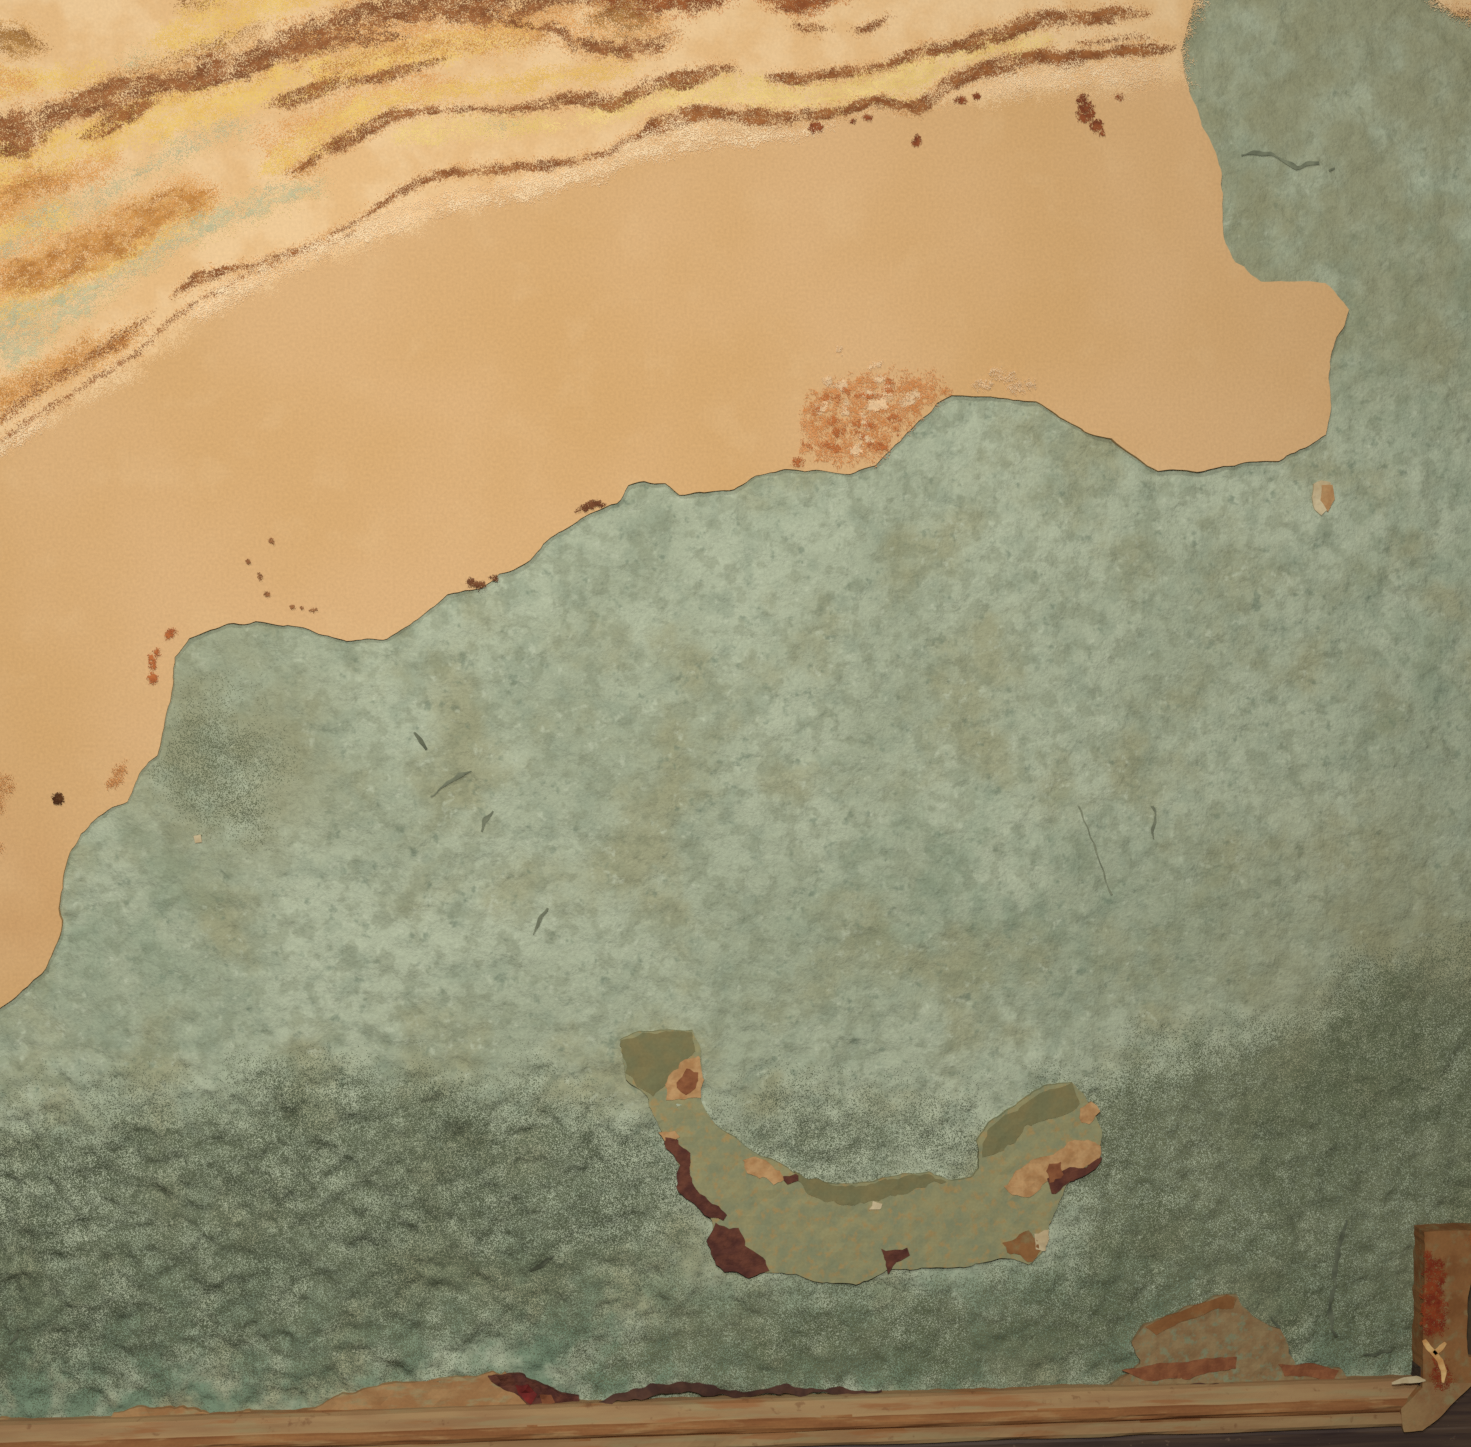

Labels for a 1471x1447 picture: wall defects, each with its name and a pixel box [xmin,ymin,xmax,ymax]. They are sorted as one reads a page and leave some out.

water stain [1424,0,1471,28]
water stain [0,0,1211,460]
rust [790,345,953,471]
peeling [1311,480,1335,515]
water stain [0,914,1471,1418]
peeling [620,1029,1122,1285]
peeling [308,1371,527,1410]
spalling [488,1372,579,1405]
peeling [1111,1275,1413,1385]
rust [1418,1251,1455,1391]